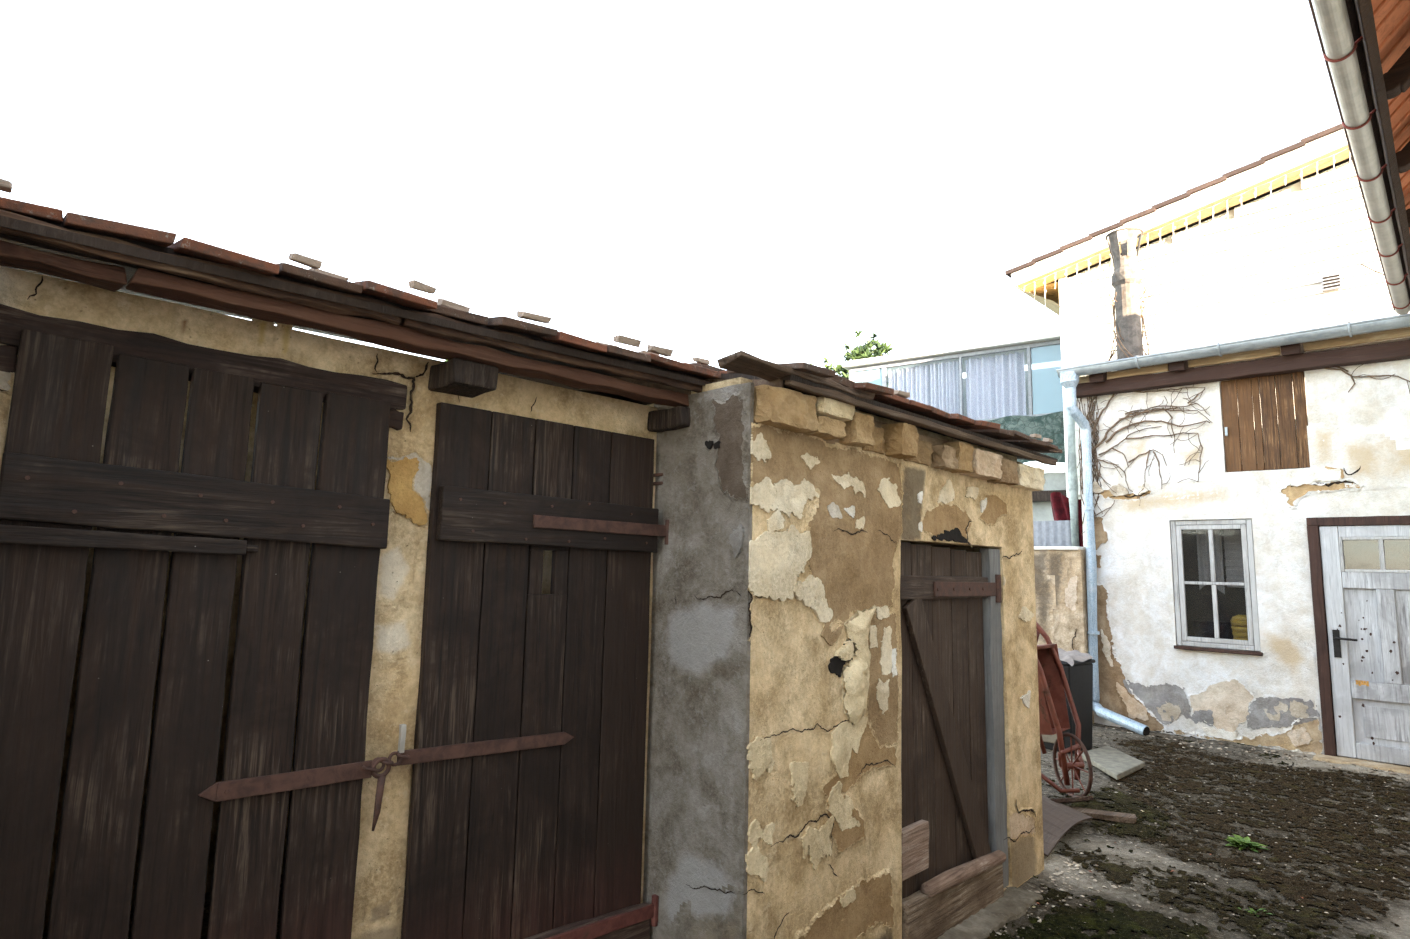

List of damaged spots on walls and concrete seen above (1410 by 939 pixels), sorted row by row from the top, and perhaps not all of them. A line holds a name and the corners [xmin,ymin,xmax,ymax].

peeling [387,450,433,526]
peeling [1092,420,1238,501]
flaking render [1278,466,1365,510]
peeling [705,391,1007,870]
flaking render [1063,575,1079,650]
flaking render [1094,517,1323,755]
crack [760,715,864,741]
peeling [745,819,775,882]
crack [772,813,837,876]
flaking render [1004,799,1036,842]
crack [686,884,789,939]
flaking render [794,868,896,939]